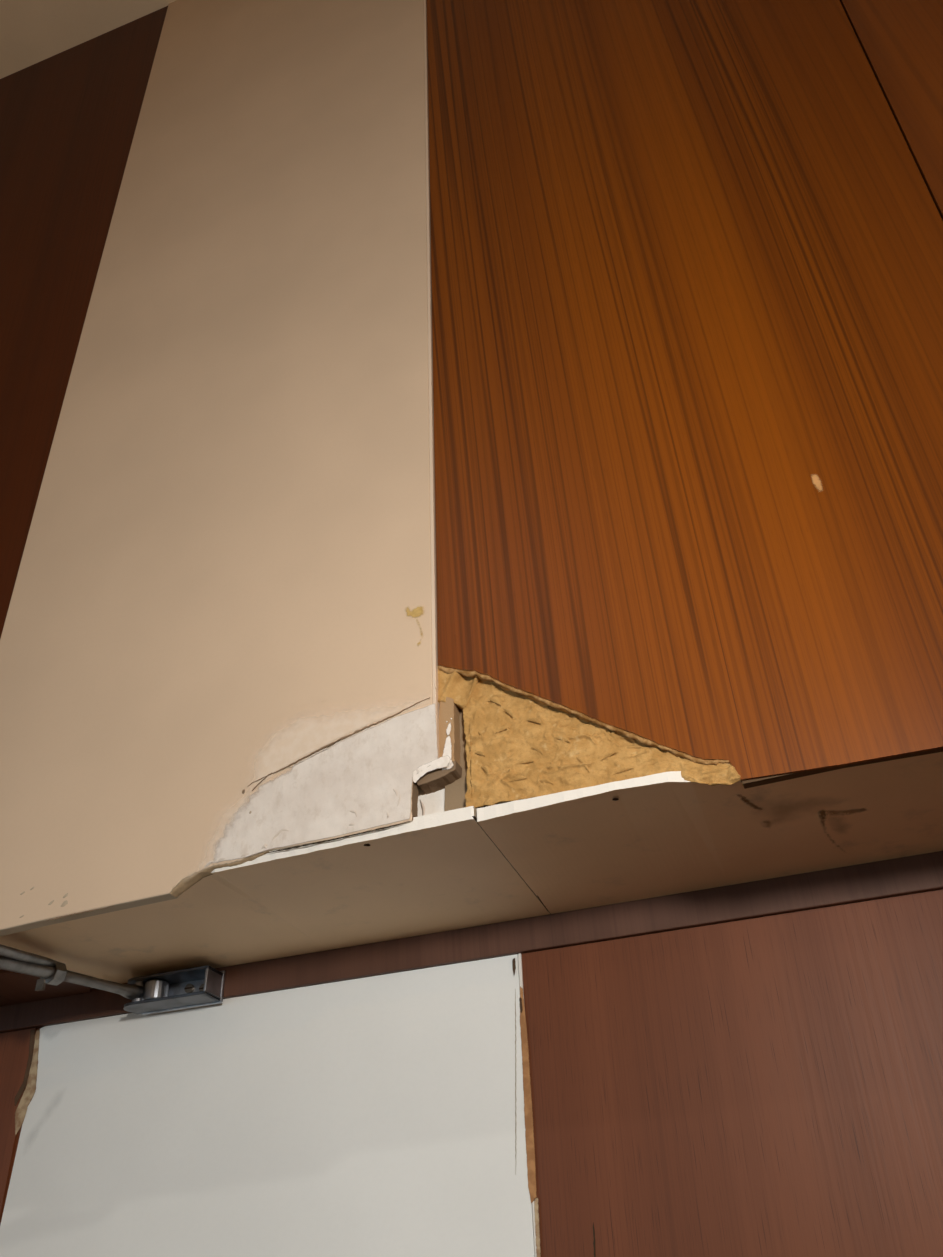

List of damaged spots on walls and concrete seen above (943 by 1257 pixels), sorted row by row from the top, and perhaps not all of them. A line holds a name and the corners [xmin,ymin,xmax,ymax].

peeling [170,697,542,897]